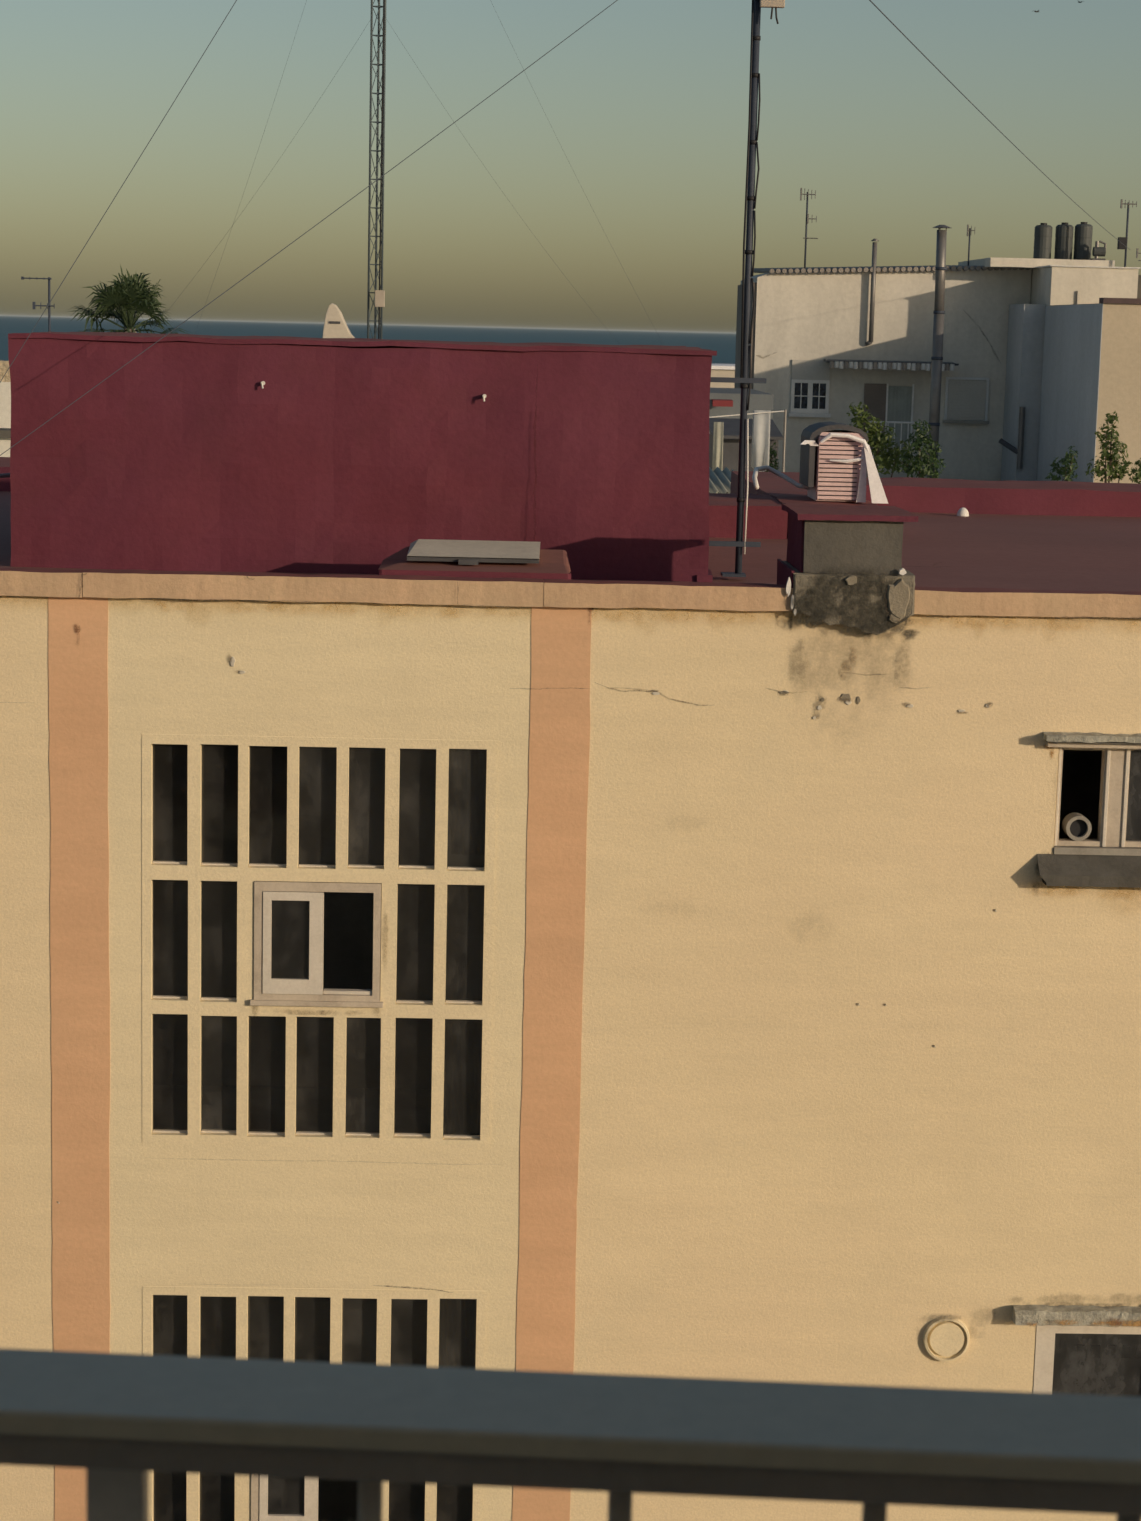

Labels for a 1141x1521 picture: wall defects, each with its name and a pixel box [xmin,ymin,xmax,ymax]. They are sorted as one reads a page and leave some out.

peeling [786,577,797,615]
spalling [885,568,913,624]